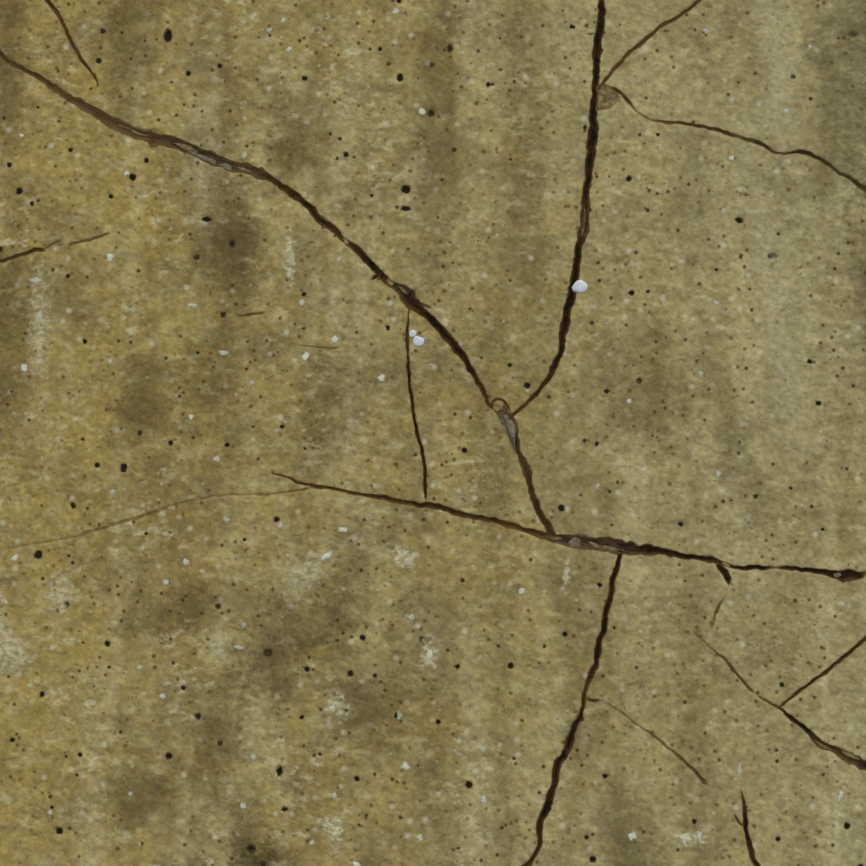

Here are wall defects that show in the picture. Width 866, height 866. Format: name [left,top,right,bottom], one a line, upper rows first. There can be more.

crack [649,119,866,192]
crack [0,0,702,537]
crack [777,566,866,583]
crack [272,473,774,866]
crack [715,636,866,770]